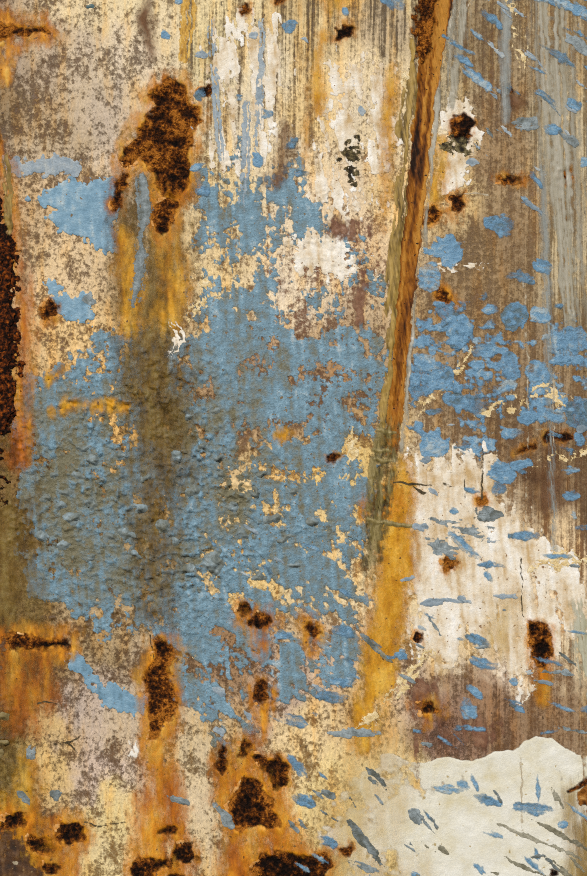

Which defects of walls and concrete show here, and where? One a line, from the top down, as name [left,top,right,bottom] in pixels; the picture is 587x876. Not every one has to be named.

corrosion [0,183,34,467]
corrosion [107,70,204,337]
peeling [2,0,410,757]
corrosion [431,112,476,202]
peeling [422,96,485,227]
peeling [436,262,489,273]
spalling [495,173,526,186]
peeling [355,286,587,729]
corrosion [131,634,188,876]
corrosion [210,735,335,876]
peeling [318,736,587,876]
corrosion [567,778,587,821]